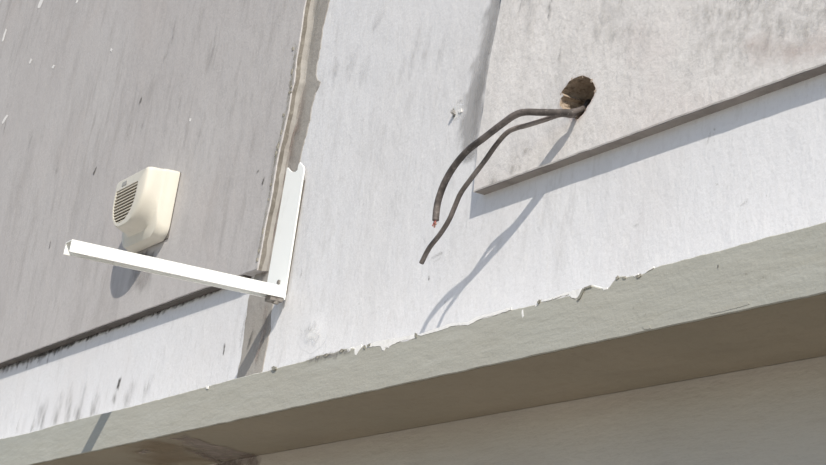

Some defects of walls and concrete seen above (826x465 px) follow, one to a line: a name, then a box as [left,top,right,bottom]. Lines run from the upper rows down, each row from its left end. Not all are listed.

damp [463,0,499,160]
spalling [535,285,592,307]
peeling [316,307,512,359]